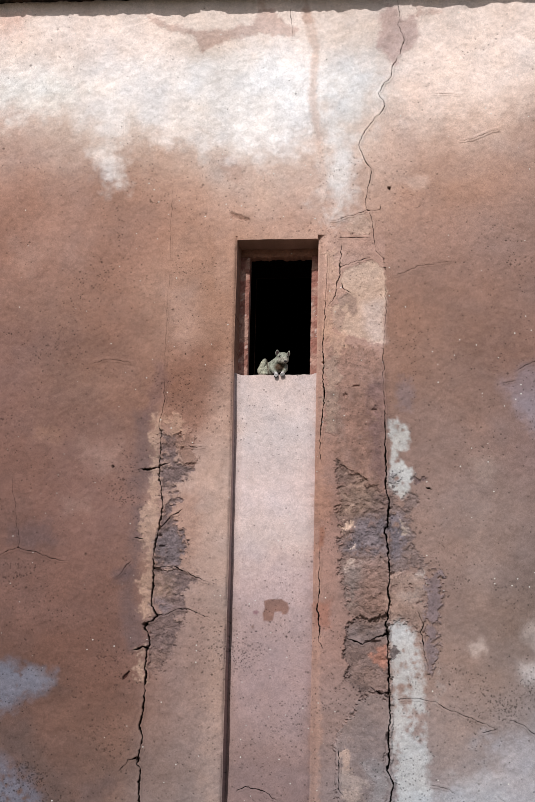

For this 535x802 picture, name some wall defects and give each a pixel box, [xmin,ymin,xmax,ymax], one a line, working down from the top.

leakage [0,0,535,236]
leakage [0,747,55,802]
leakage [0,653,62,721]
crack [0,475,71,564]
spalling [121,410,201,687]
crack [113,274,213,802]
crack [313,546,327,653]
spalling [308,458,447,802]
efflorescence [388,415,417,499]
crack [317,0,535,802]